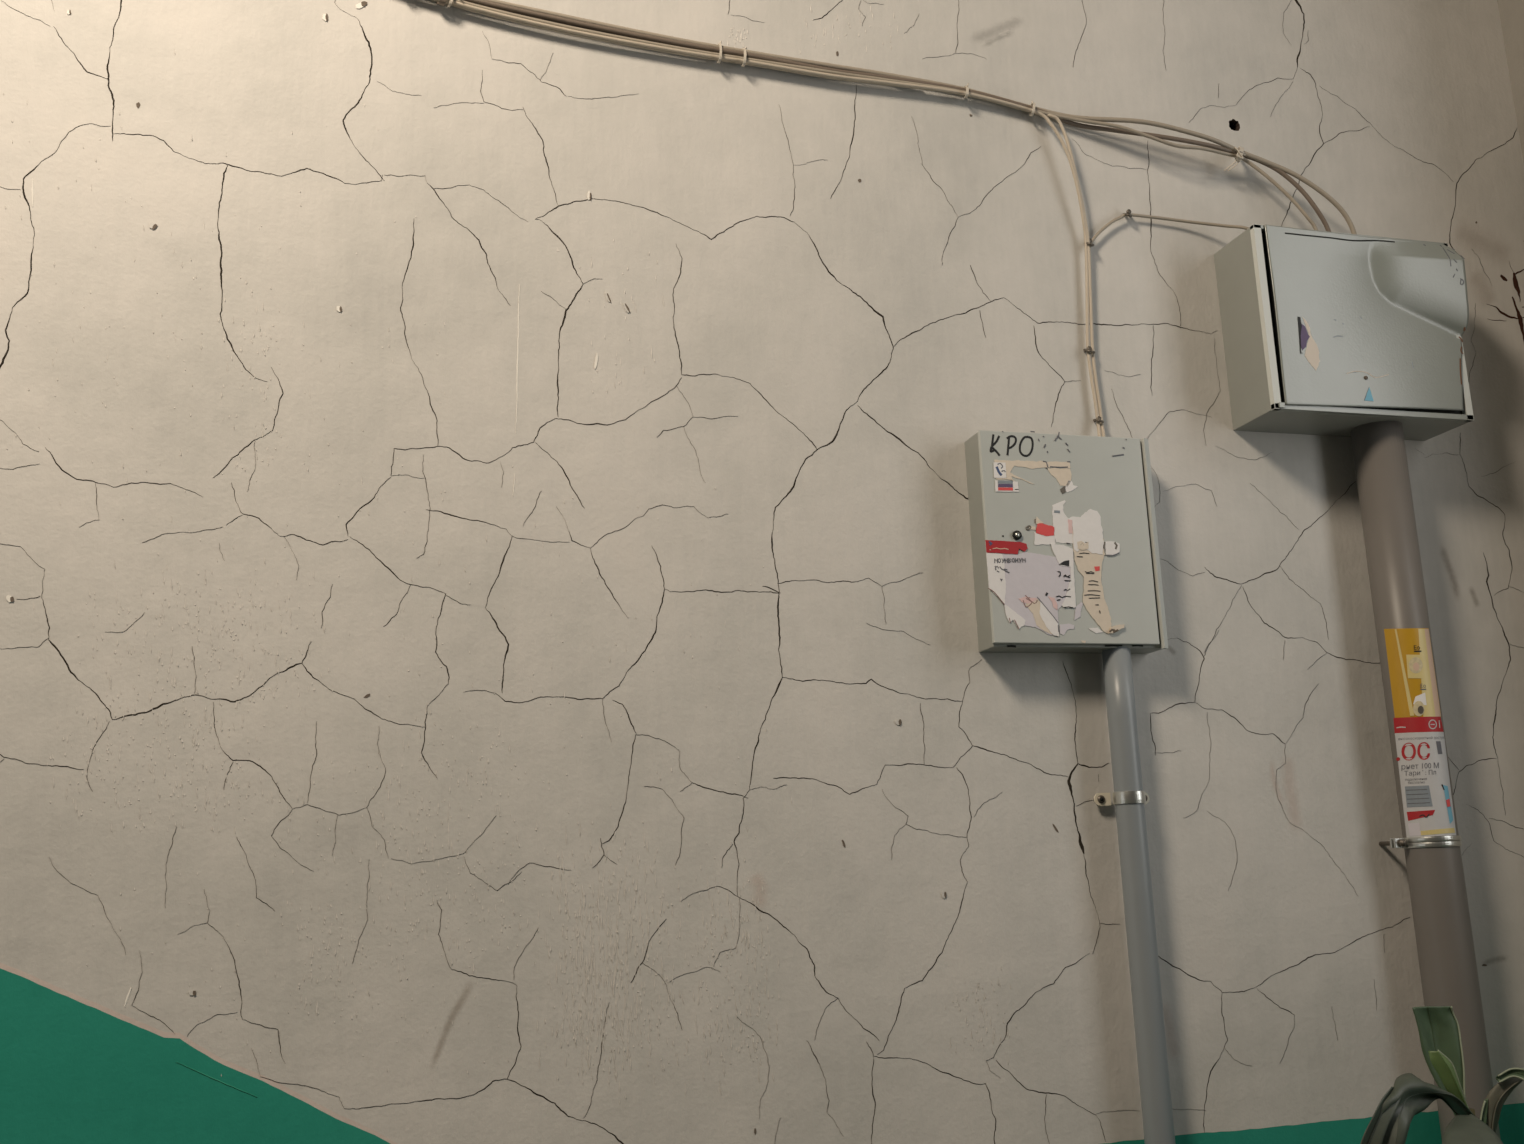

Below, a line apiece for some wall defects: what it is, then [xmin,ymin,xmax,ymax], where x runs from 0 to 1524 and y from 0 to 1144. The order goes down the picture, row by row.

crack [1194,0,1524,376]
crack [0,0,1217,1144]
crack [1150,481,1371,890]
crack [1428,433,1523,857]
crack [1159,917,1410,1133]